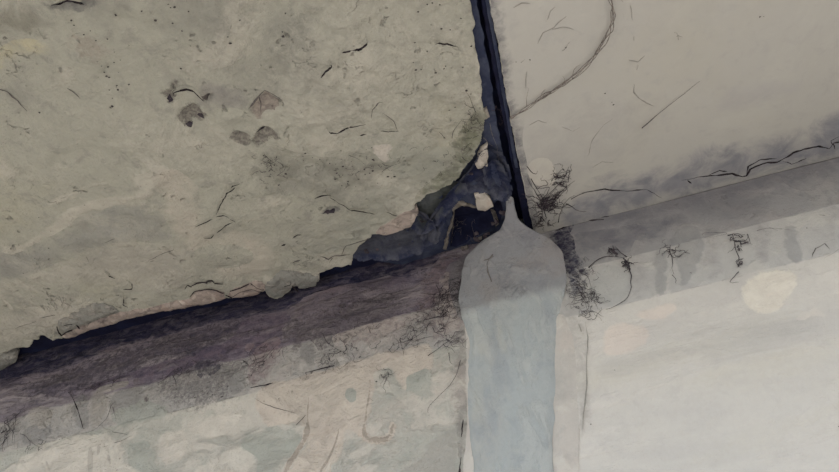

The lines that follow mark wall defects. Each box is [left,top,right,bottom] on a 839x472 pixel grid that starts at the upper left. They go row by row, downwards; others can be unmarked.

peeling [0,0,513,353]
water stain [523,75,839,304]
crack [687,138,839,184]
water stain [0,252,443,433]
peeling [11,313,440,472]